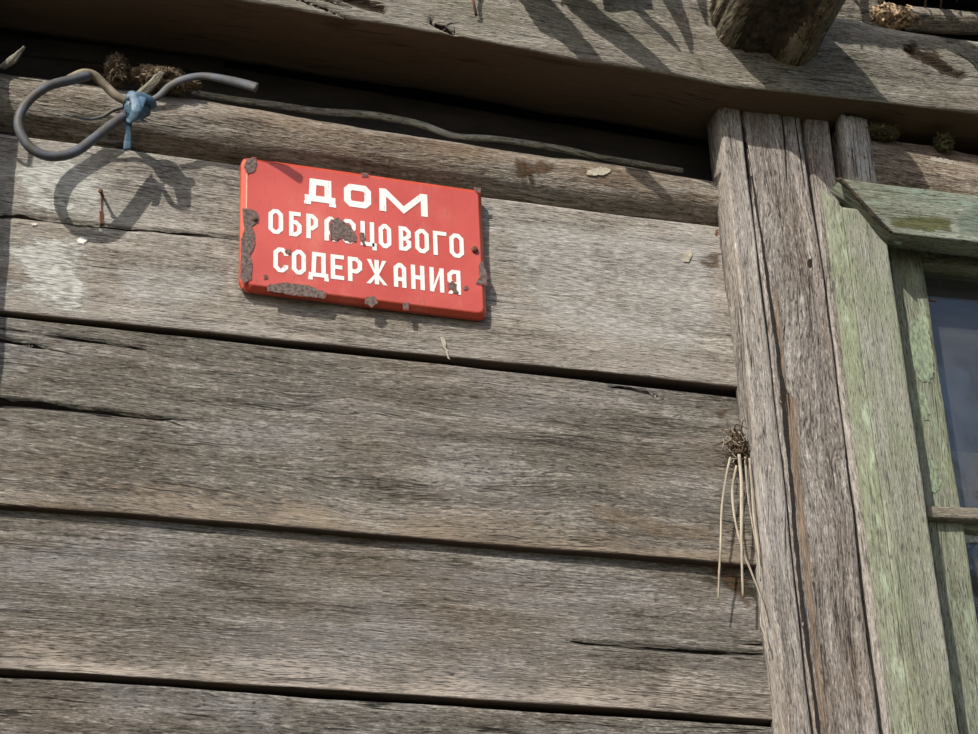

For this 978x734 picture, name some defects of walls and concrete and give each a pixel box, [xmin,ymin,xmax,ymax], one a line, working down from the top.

crack [0,397,192,428]
crack [566,640,763,656]